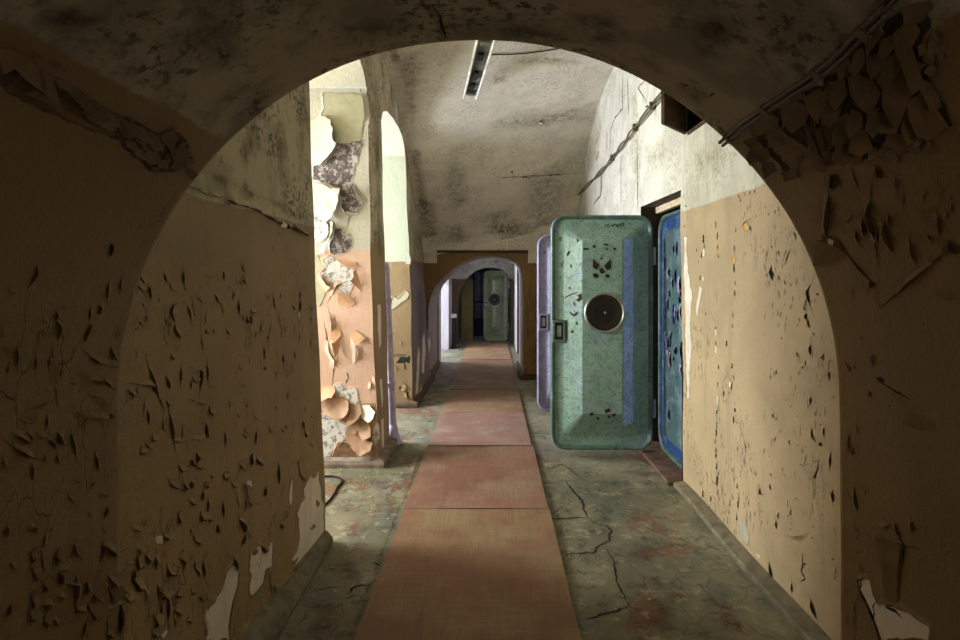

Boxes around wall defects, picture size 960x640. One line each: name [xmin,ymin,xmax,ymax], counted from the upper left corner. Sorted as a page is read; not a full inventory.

spalling [0,47,384,640]
flaking render [377,289,410,349]
peeling [742,0,957,506]
crack [544,464,638,619]
flaking render [855,538,935,640]